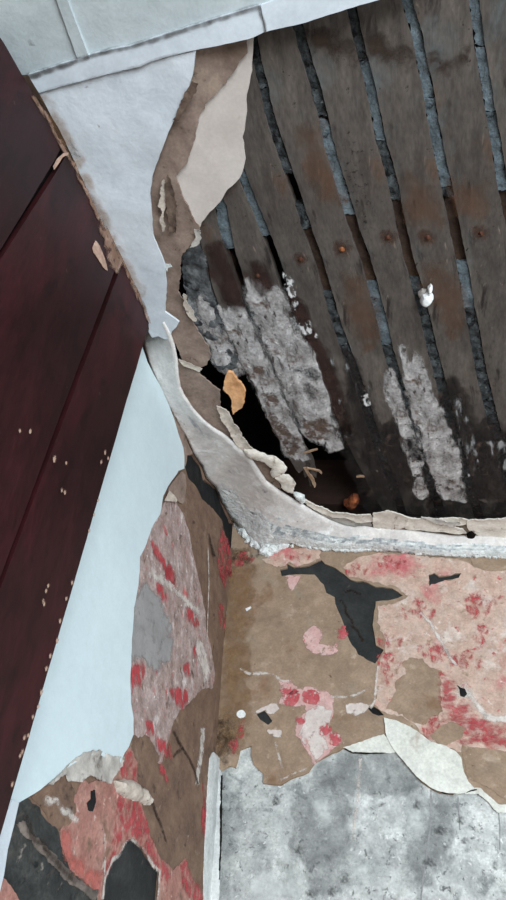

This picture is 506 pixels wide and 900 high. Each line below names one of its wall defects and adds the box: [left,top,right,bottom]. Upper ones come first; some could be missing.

peeling [32,96,151,323]
peeling [150,37,506,538]
water stain [196,241,506,519]
peeling [130,411,215,782]
peeling [218,529,506,813]
peeling [0,748,222,900]